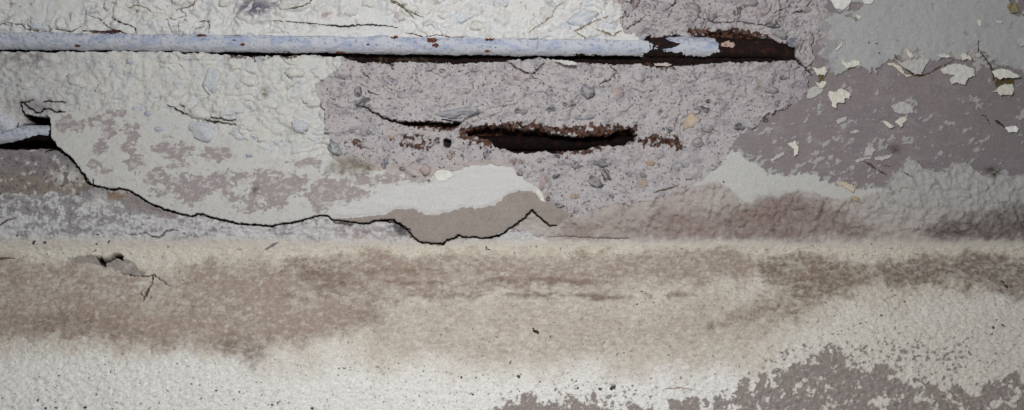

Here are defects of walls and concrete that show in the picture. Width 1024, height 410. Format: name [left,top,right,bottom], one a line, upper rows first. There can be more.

corrosion [687,21,774,40]
crack [18,100,630,250]
crack [363,72,405,125]
spalling [0,0,1024,219]
corrosion [389,119,682,159]
water stain [0,250,869,347]
water stain [881,253,1024,296]
peeling [478,320,1024,410]